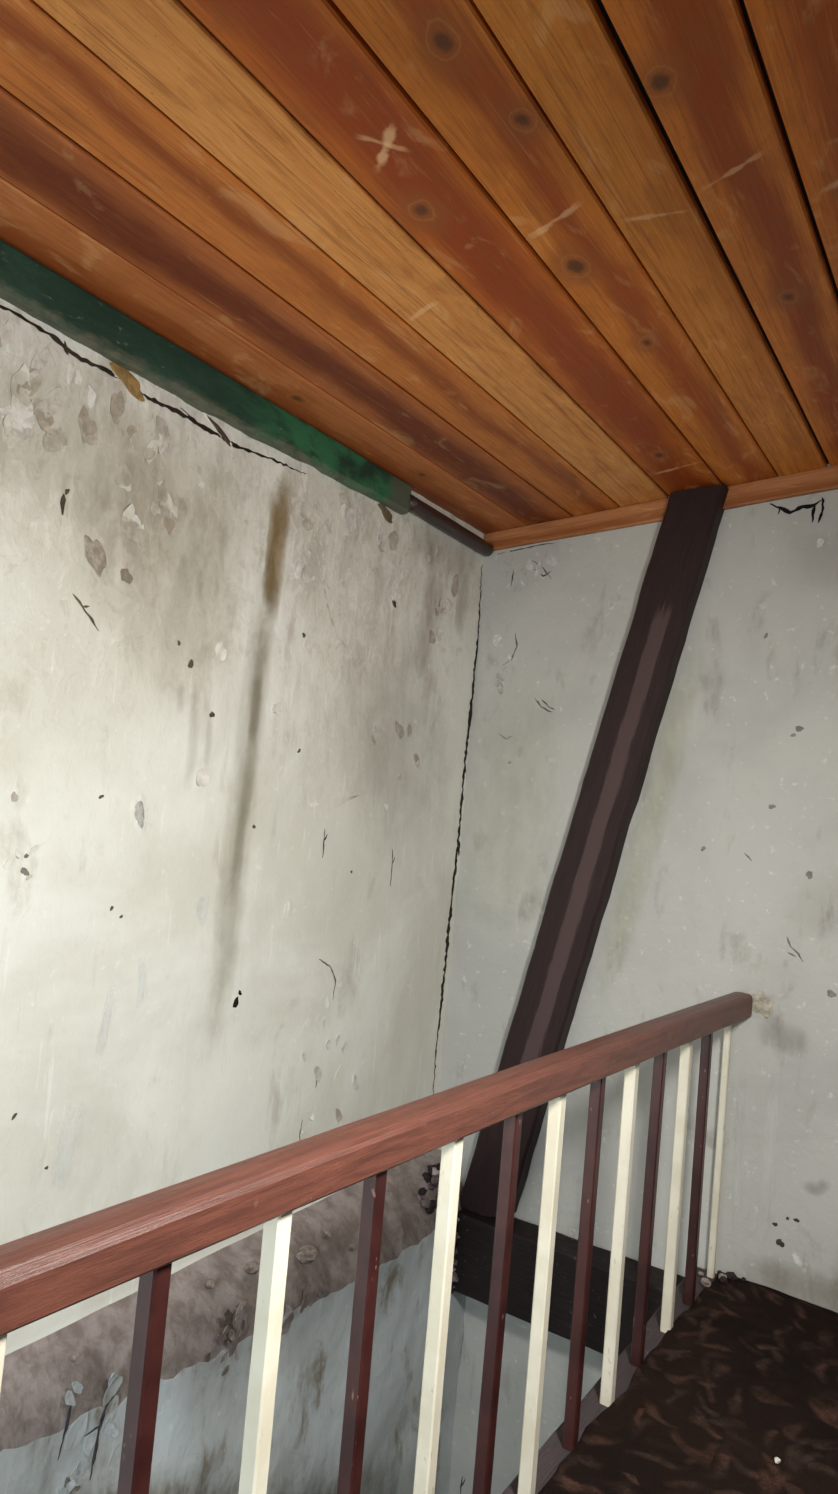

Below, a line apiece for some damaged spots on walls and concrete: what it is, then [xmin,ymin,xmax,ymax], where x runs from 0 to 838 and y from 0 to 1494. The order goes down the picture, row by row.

crack [0,305,306,474]
damp [266,495,287,603]
spalling [413,1162,441,1221]
spalling [451,1212,461,1294]
spalling [206,1303,251,1376]
spalling [281,1286,329,1335]
peeling [57,1373,123,1494]